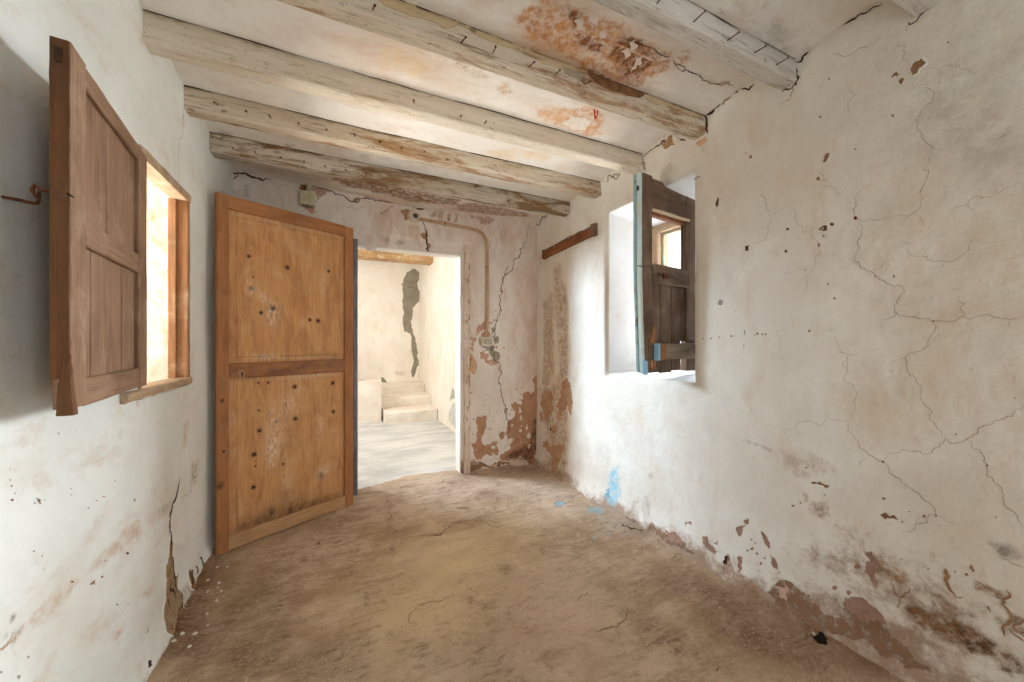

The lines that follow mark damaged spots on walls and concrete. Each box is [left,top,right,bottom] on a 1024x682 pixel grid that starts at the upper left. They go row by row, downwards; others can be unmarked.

crack [143,9,664,194]
damp [528,99,611,140]
crack [688,0,810,104]
flaking render [892,55,928,84]
crack [209,132,573,444]
peeling [470,374,574,484]
damp [771,441,848,490]
crack [162,476,197,637]
peeling [619,513,693,554]
peeling [702,519,932,672]
damp [858,546,1024,672]
damp [918,502,998,564]